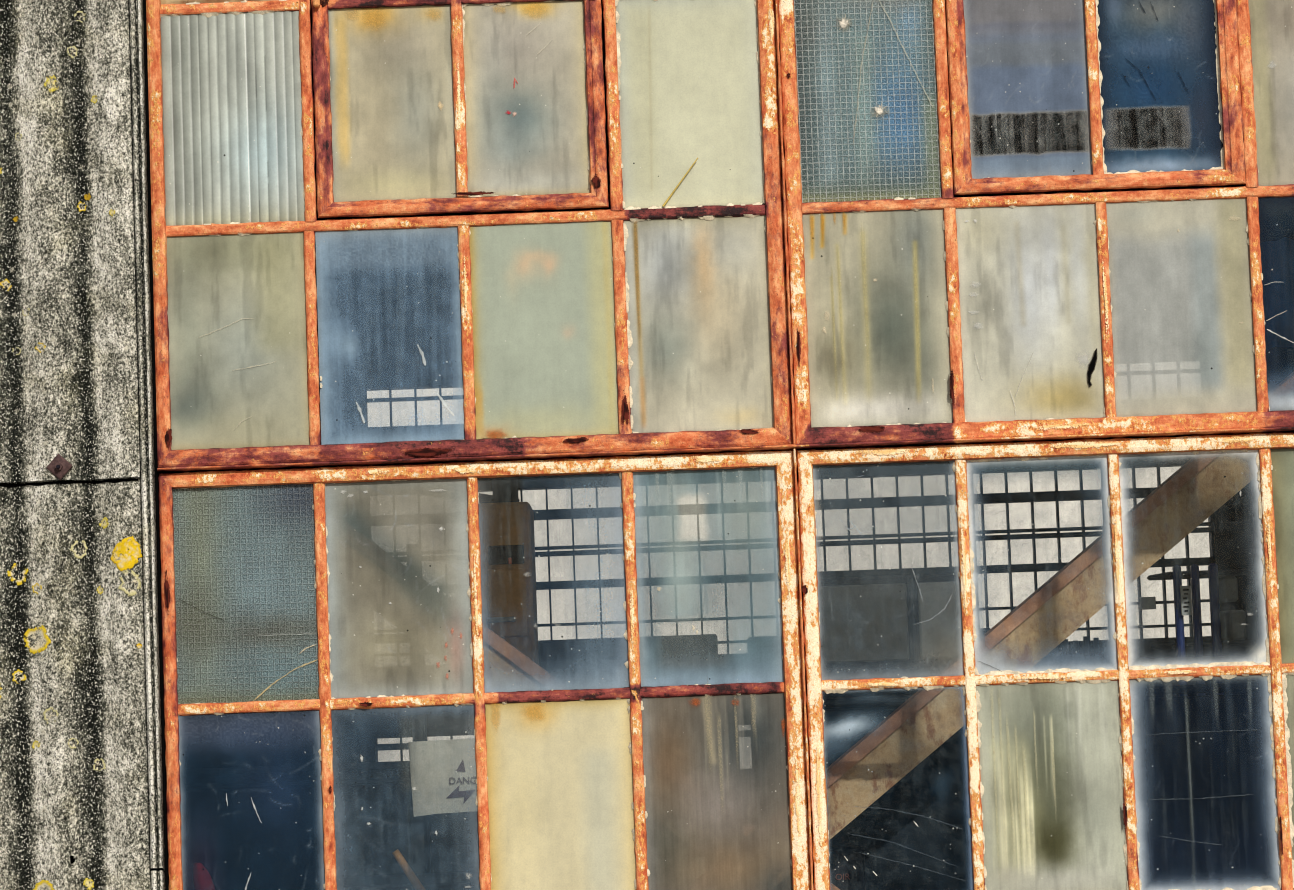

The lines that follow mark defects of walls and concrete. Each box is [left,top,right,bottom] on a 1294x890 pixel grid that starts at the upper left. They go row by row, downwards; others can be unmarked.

rust [856,425,894,433]
rust [404,447,452,456]
peeling [794,751,802,836]